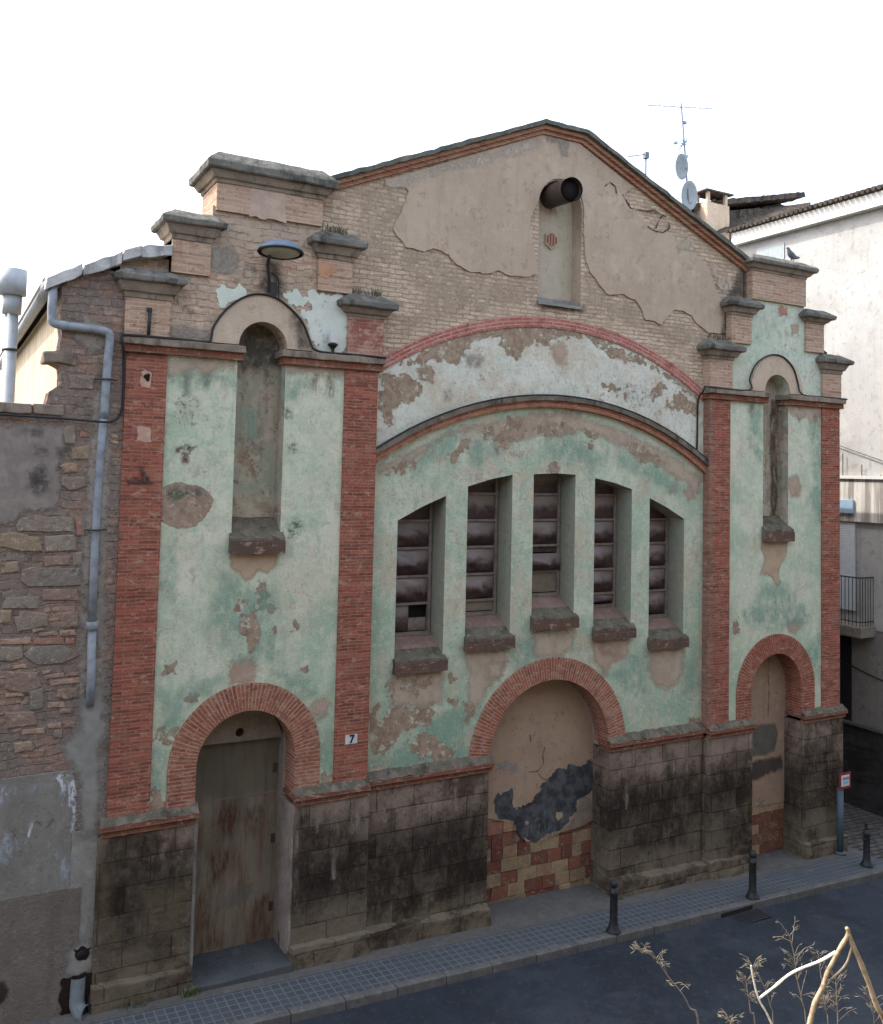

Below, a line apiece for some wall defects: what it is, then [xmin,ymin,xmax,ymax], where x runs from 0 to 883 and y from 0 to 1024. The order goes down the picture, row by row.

peeling [161,482,214,529]
flaking render [377,327,714,725]
peeling [761,542,787,586]
peeling [229,554,300,684]
peeling [369,650,506,762]
water stain [68,779,76,831]
spalling [543,797,593,838]